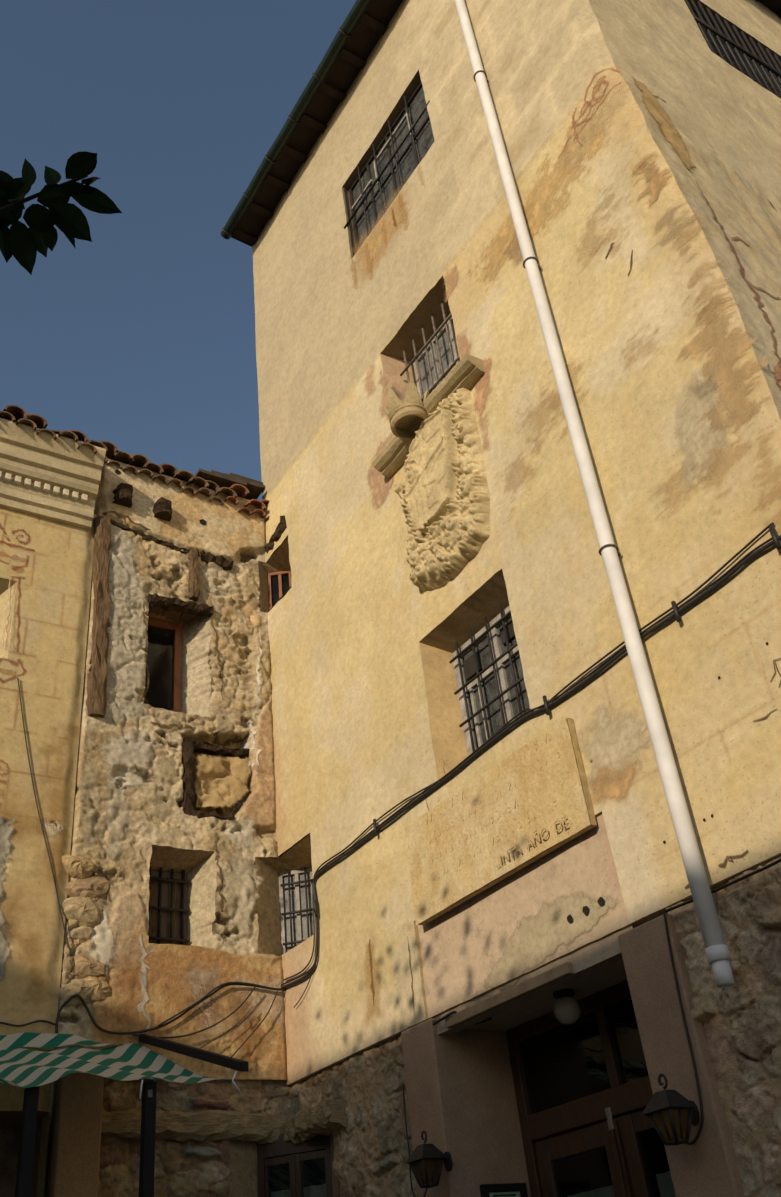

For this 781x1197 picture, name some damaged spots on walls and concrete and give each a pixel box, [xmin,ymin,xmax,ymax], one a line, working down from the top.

crack [696,181,781,387]
peeling [0,816,16,980]
crack [137,934,151,1047]